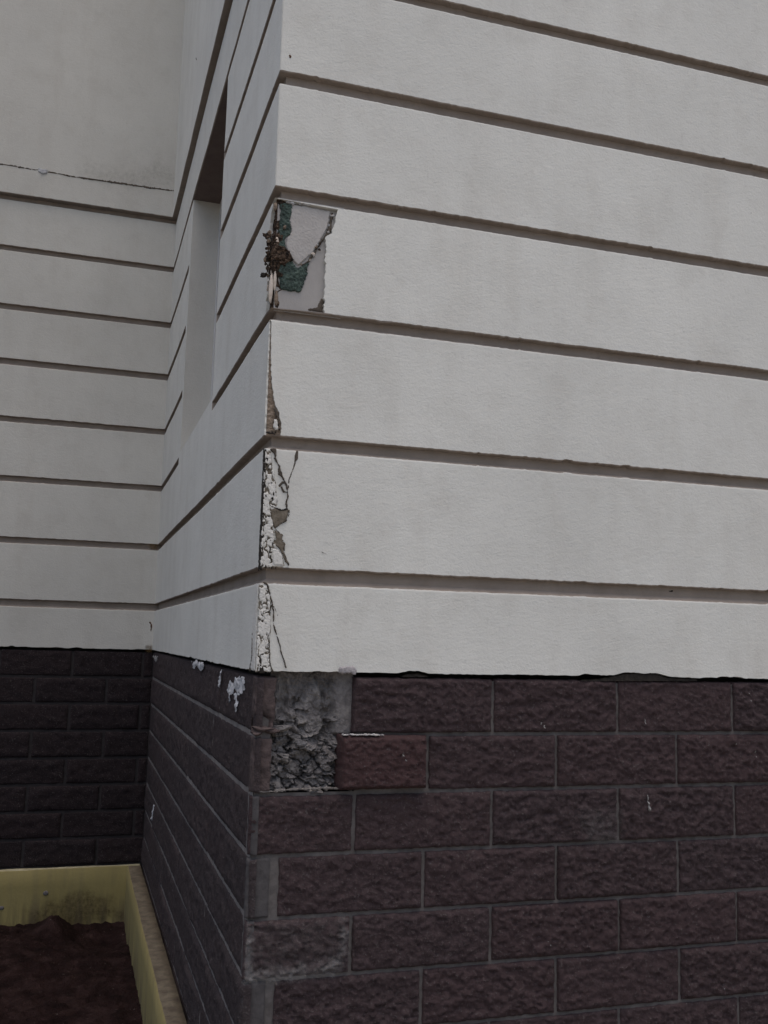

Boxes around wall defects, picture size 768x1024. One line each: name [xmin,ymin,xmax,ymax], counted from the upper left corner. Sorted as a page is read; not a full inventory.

spalling [260,198,344,319]
spalling [266,325,281,435]
peeling [258,449,290,571]
crack [270,448,298,511]
crack [263,582,287,672]
spalling [249,585,353,794]